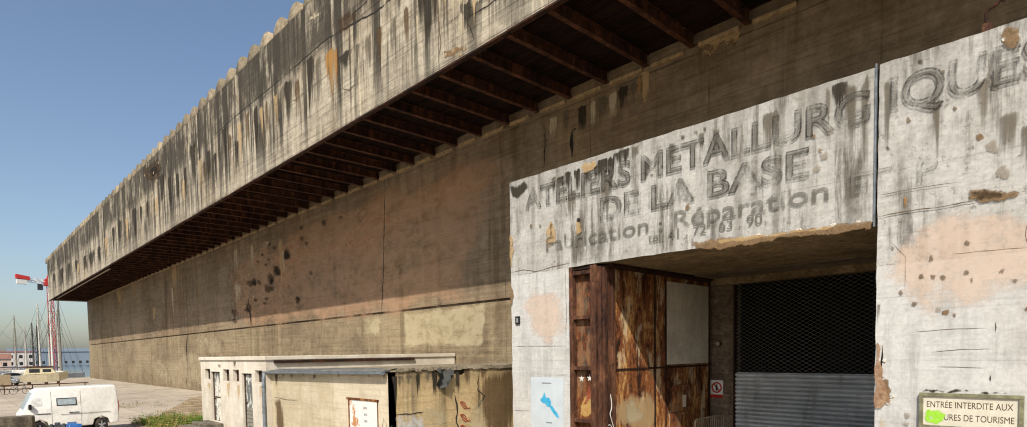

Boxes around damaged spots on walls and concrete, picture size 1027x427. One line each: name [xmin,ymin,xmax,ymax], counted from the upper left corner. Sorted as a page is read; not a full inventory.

corrosion [325,49,337,88]
water stain [979,78,988,112]
water stain [53,0,475,284]
peeling [976,134,998,152]
water stain [1000,112,1027,144]
spalling [969,165,1019,203]
spalling [692,221,872,250]
spalling [232,243,290,323]
water stain [383,371,443,403]
water stain [456,368,513,427]
spalling [874,343,894,409]